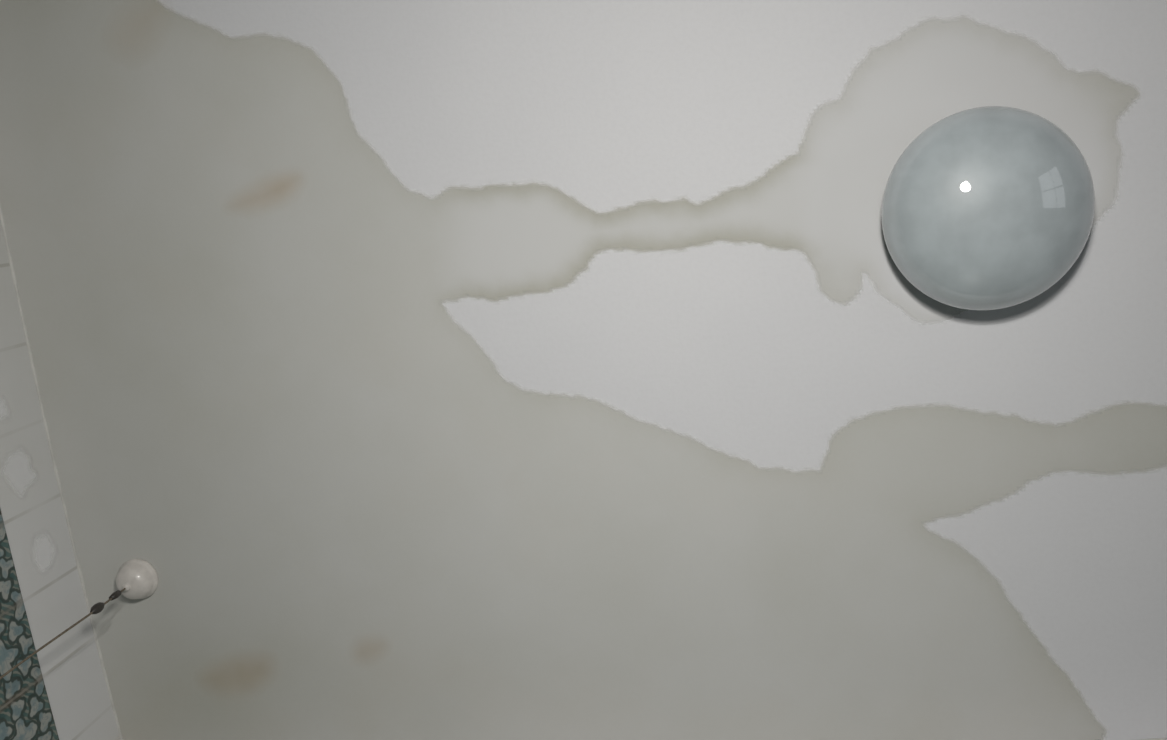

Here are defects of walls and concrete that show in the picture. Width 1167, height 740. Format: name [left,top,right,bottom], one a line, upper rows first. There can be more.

leakage [432,145,806,309]
leakage [801,17,1139,322]
leakage [0,220,120,740]
leakage [820,403,1167,524]